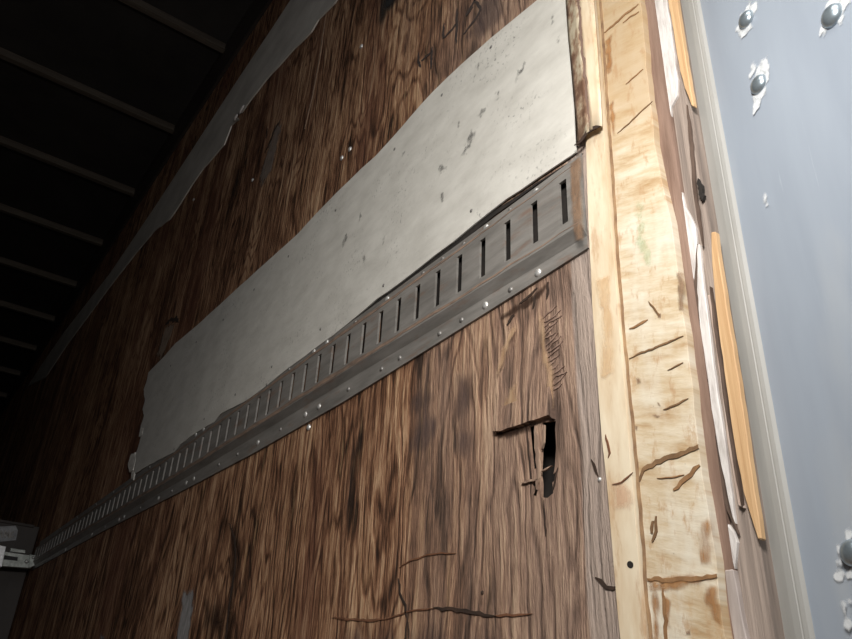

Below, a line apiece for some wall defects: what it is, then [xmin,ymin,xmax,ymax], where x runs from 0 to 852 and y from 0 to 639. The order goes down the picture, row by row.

peeling [736,2,757,38]
peeling [825,0,850,23]
peeling [749,59,769,115]
peeling [834,530,852,581]
crack [333,552,532,639]
peeling [841,600,852,630]